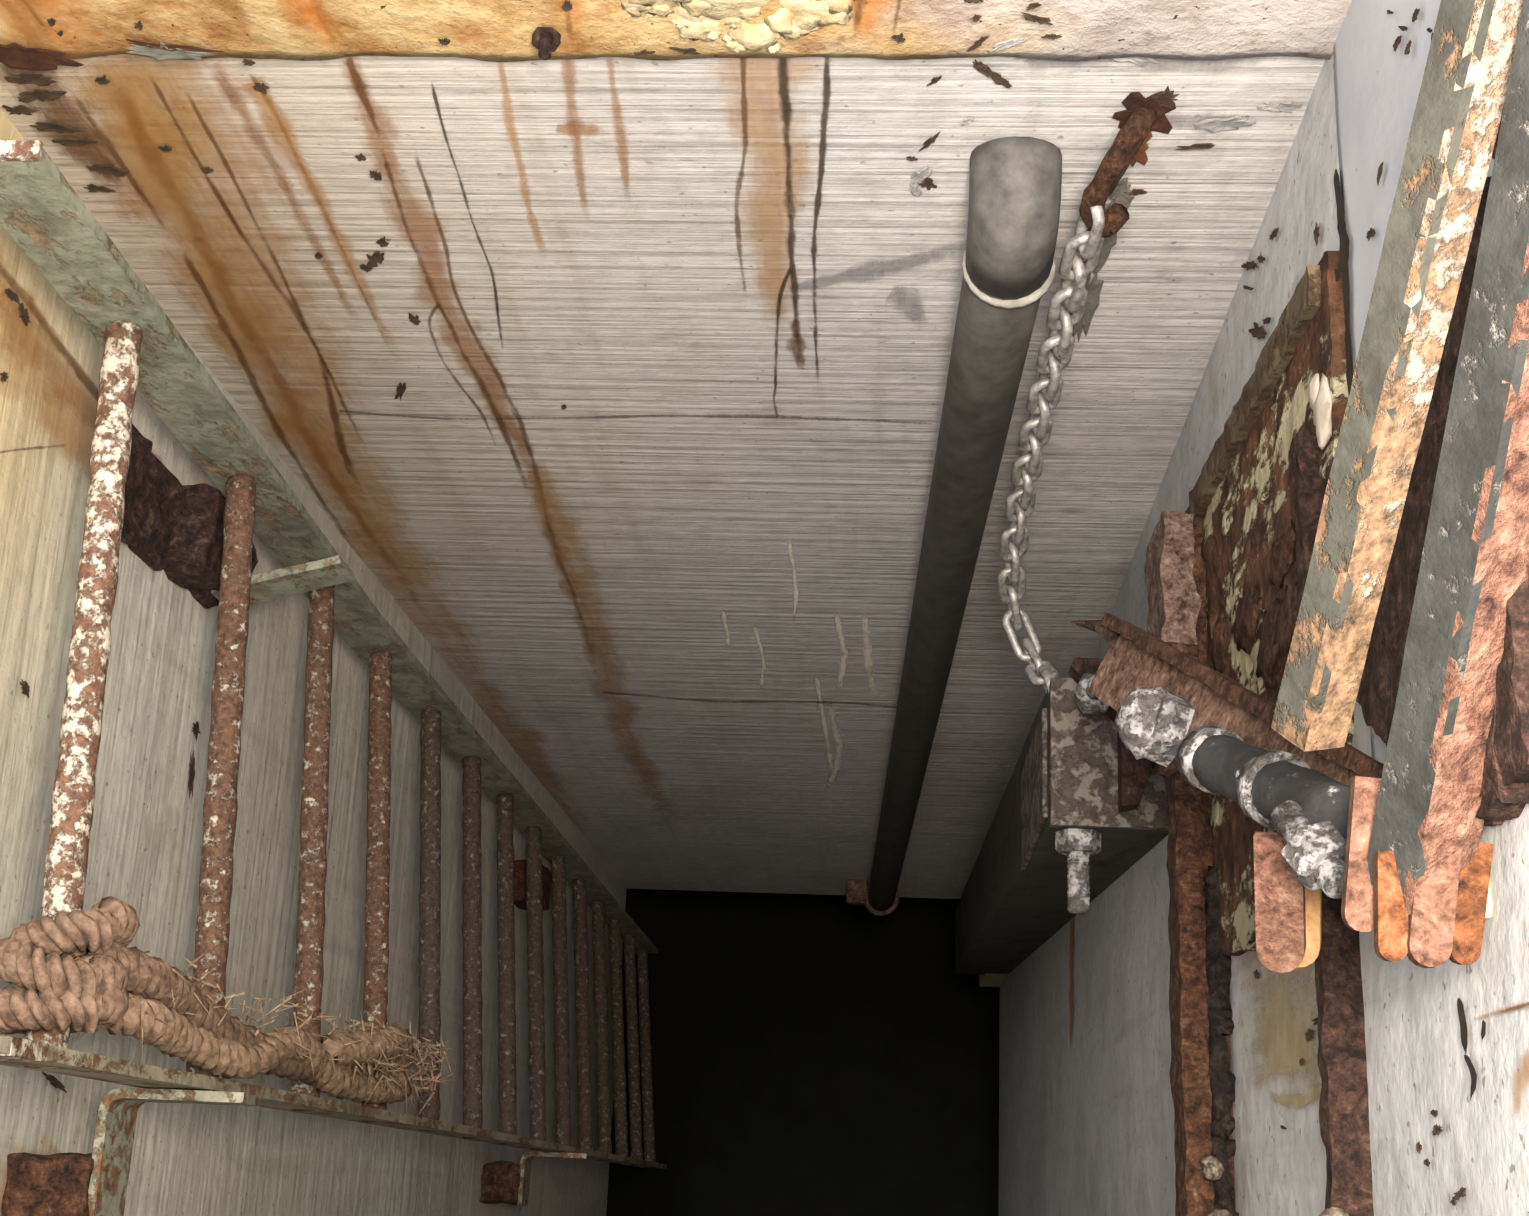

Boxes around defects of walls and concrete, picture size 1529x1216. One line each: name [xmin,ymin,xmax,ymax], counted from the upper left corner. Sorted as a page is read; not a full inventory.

corrosion [6,68,151,207]
corrosion [189,104,308,331]
corrosion [186,259,335,519]
corrosion [316,347,351,471]
corrosion [347,59,377,129]
corrosion [432,87,502,340]
corrosion [417,163,575,594]
crack [339,383,920,424]
water stain [619,0,940,385]
peeling [1241,256,1265,290]
peeling [1248,317,1271,340]
peeling [1387,8,1433,55]